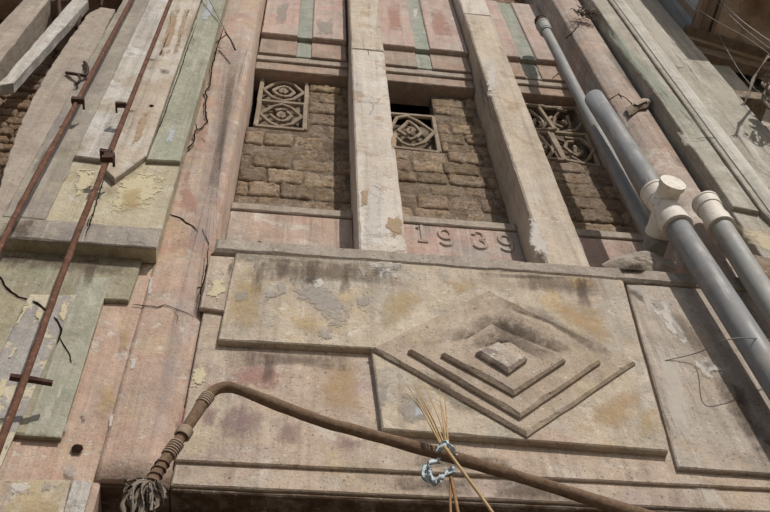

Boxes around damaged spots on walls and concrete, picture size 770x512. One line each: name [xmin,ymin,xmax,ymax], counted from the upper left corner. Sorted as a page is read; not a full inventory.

crack [152,23,197,145]
crack [178,26,225,181]
peeling [75,168,95,197]
peeling [110,169,166,212]
peeling [386,217,403,237]
crack [0,276,72,363]
crack [133,214,209,319]
peeling [198,279,226,303]
peeling [266,275,349,339]